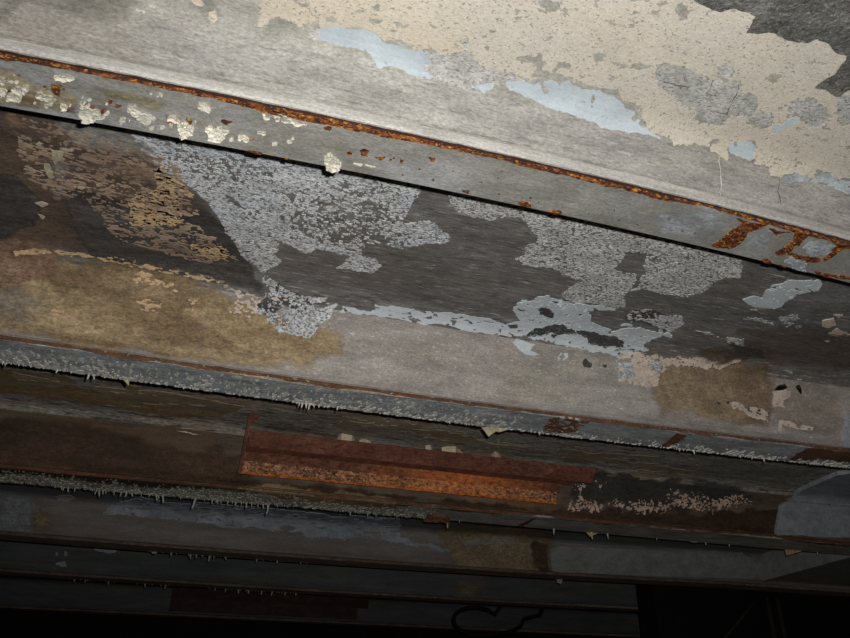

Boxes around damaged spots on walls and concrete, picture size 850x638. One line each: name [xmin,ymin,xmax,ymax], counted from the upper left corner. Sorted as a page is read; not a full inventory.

peeling [241,0,850,194]
corrosion [0,50,850,280]
water stain [0,69,597,440]
peeling [0,74,745,388]
peeling [743,240,836,329]
spalling [93,380,246,412]
water stain [0,470,434,519]
corrosion [0,335,850,463]
corrosion [0,420,850,546]
water stain [566,471,752,515]
water stain [607,438,850,468]
water stain [655,331,850,424]